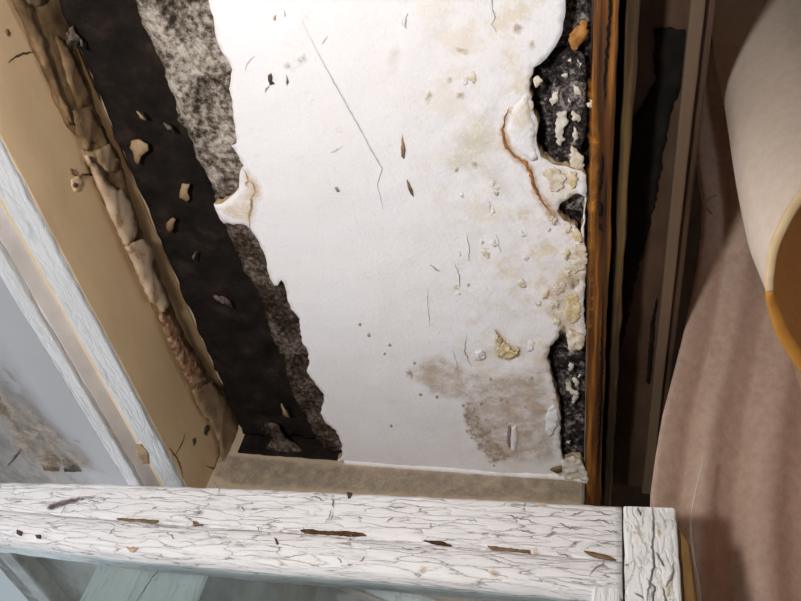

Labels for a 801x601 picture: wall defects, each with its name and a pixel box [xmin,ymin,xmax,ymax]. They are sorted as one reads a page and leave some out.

spalling [11,0,342,461]
spalling [501,0,598,481]
peeling [495,331,519,359]
peeling [0,396,36,467]
peeling [41,453,61,472]
water stain [461,377,549,467]
crack [502,502,619,574]
crack [635,503,674,601]